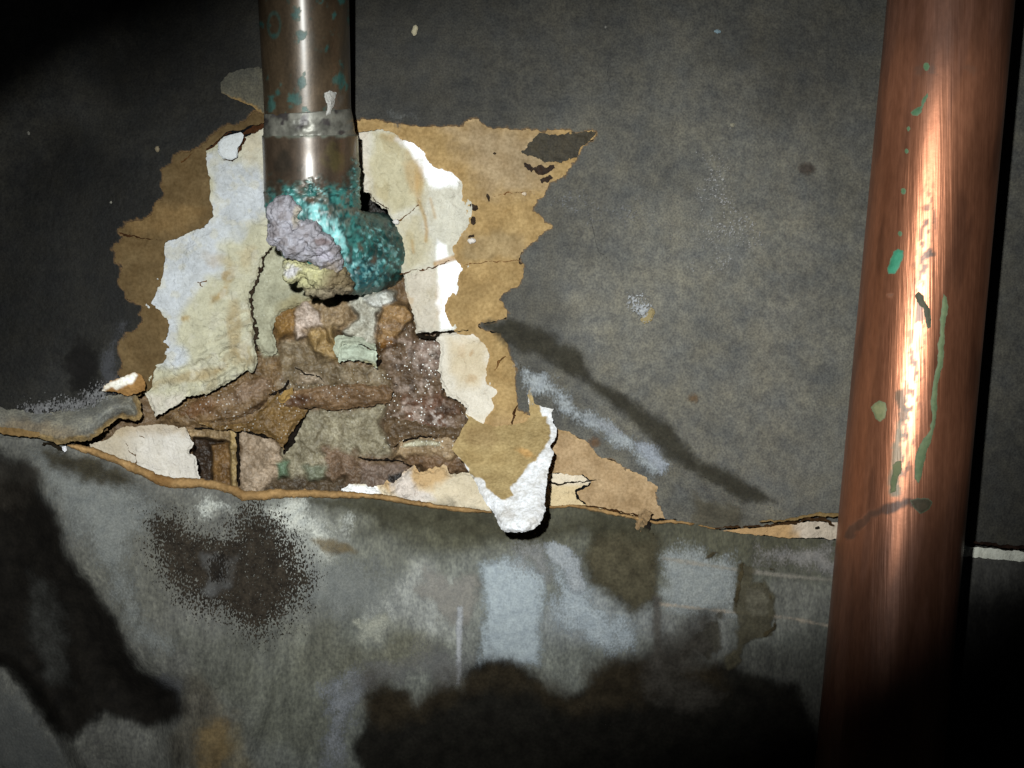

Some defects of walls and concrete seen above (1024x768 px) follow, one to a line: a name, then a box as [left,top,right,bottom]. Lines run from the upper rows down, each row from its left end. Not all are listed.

water stain [0,451,506,768]
spalling [61,123,591,533]
water stain [321,514,834,768]
water stain [486,320,767,502]
crack [715,512,839,529]
crack [964,540,1024,550]